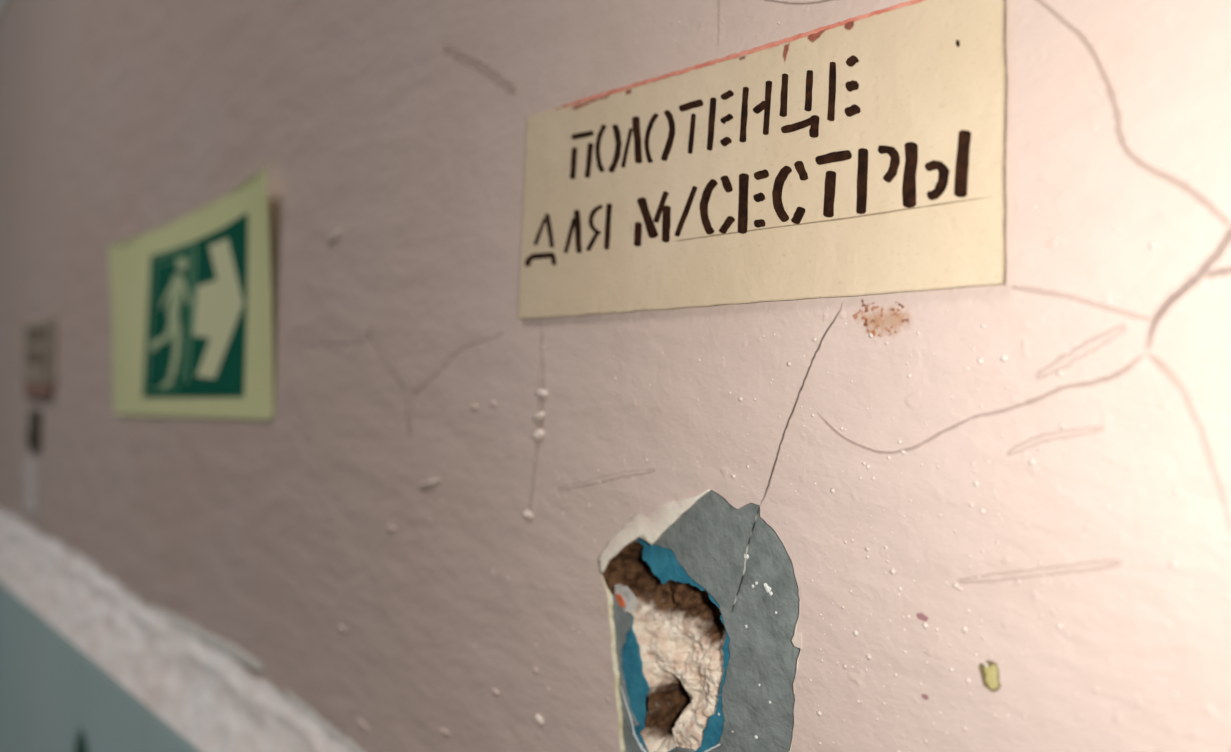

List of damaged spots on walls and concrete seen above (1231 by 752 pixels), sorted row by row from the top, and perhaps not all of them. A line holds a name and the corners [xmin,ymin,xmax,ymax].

crack [765,0,831,8]
crack [825,0,1231,527]
crack [762,312,839,500]
peeling [598,489,802,752]